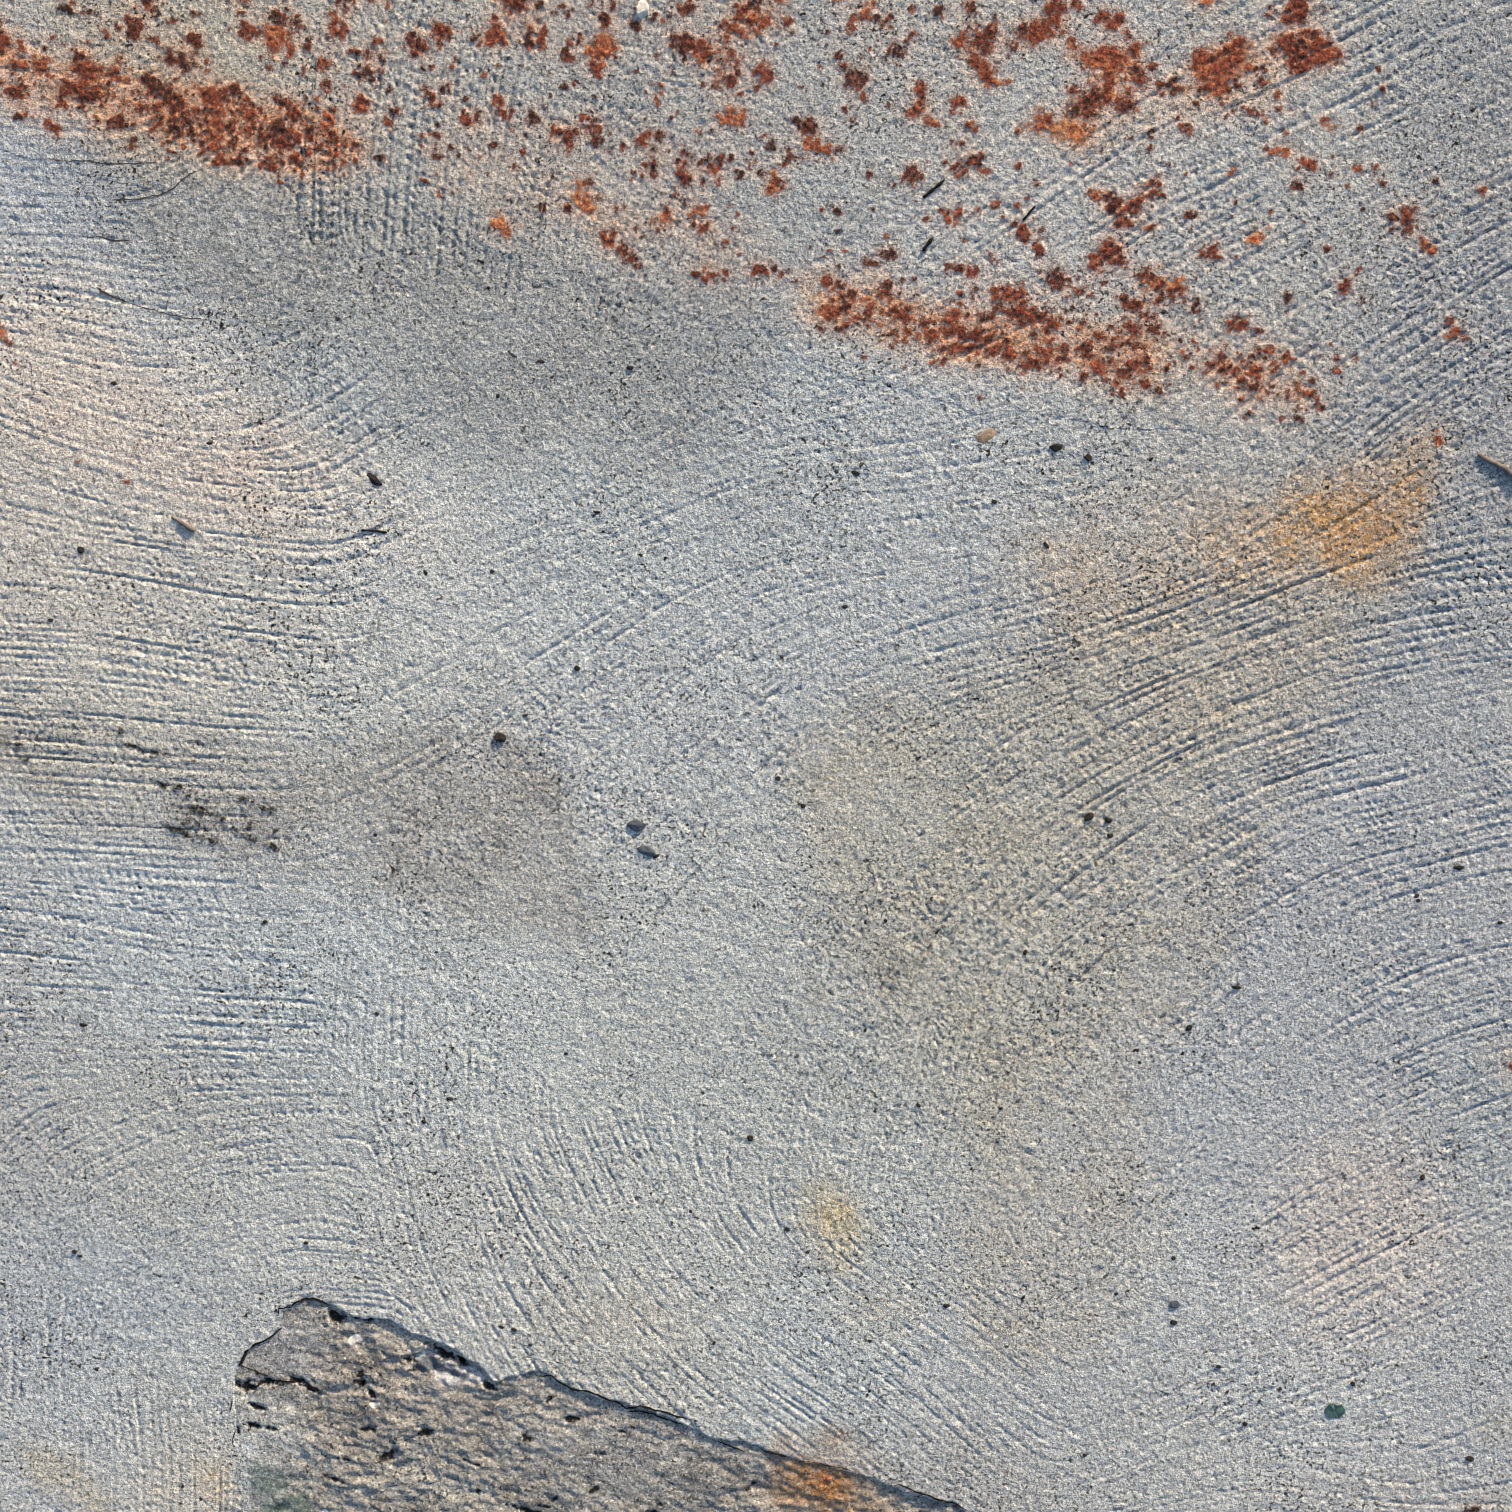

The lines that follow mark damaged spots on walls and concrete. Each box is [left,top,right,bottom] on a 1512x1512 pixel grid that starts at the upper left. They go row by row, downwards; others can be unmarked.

corrosion [0,0,1503,801]
corrosion [1465,1030,1512,1109]
spalling [234,1300,964,1512]
peeling [1324,1404,1346,1418]